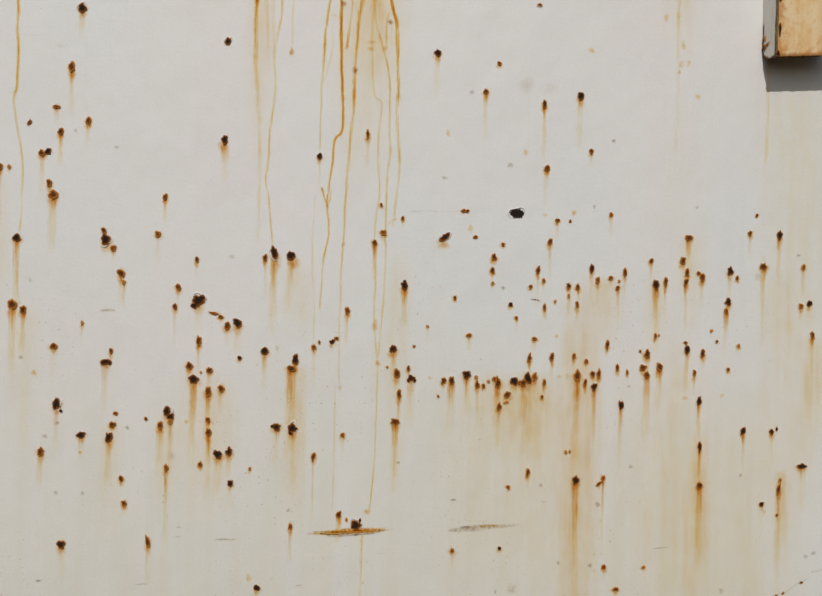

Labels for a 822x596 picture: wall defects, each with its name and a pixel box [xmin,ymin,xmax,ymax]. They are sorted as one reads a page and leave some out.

rust [762,36,820,59]
rust [46,179,58,200]
rust [680,257,705,286]
rust [7,299,26,314]
rust [572,353,601,386]
rust [639,349,663,379]
rust [474,375,511,410]
rust [518,372,546,398]